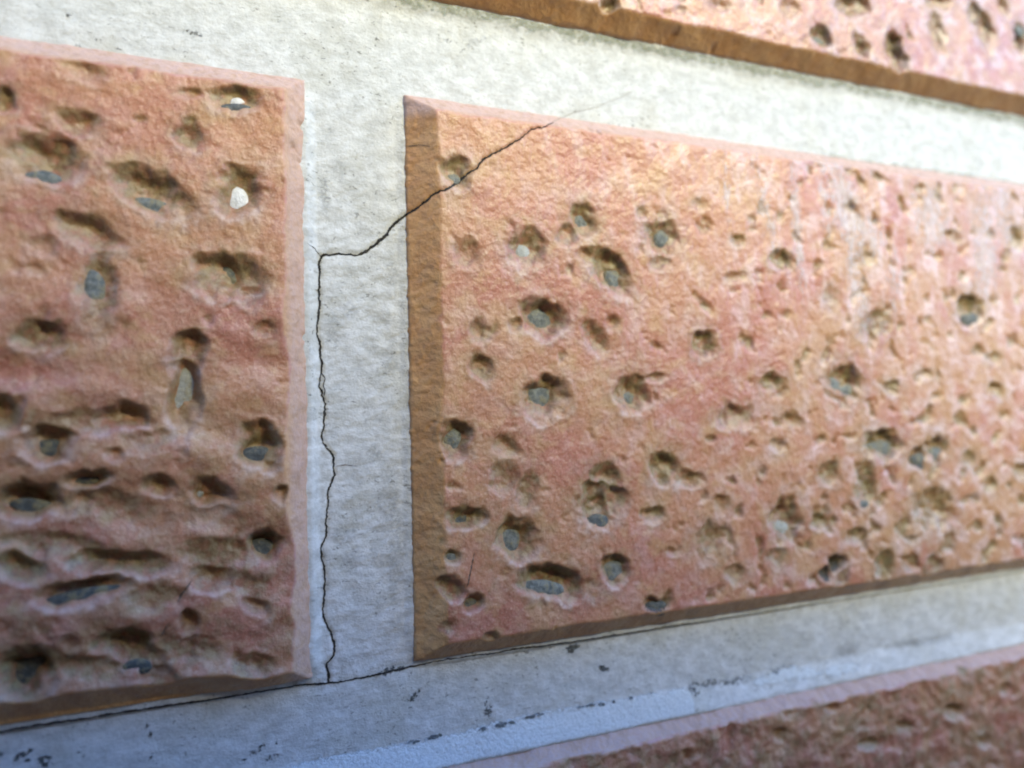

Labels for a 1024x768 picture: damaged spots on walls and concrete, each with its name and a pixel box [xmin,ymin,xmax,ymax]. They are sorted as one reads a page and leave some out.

crack [0,92,817,733]